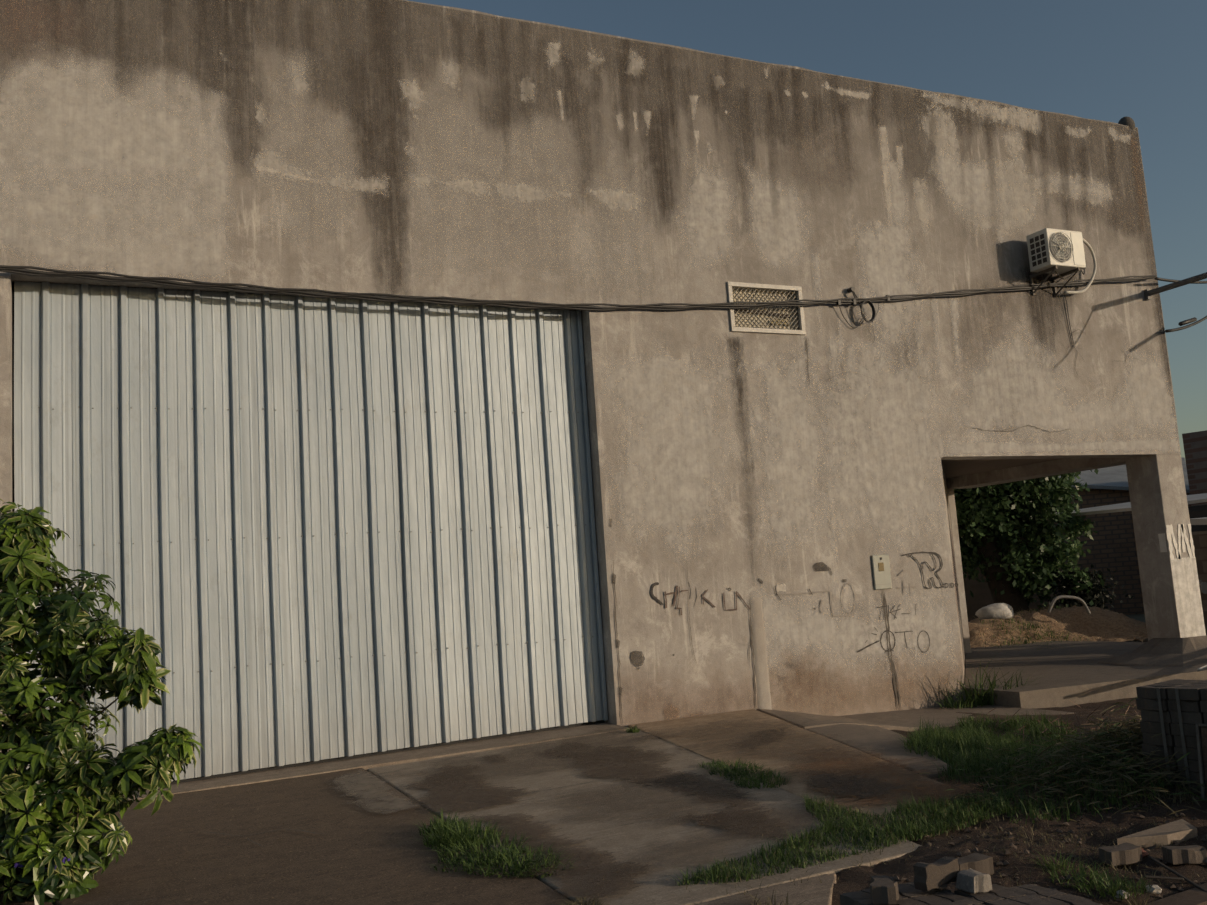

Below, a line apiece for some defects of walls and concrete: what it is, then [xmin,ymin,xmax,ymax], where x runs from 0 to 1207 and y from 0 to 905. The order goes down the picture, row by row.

damp [0,0,1179,551]
crack [960,423,1067,432]
damp [763,594,952,665]